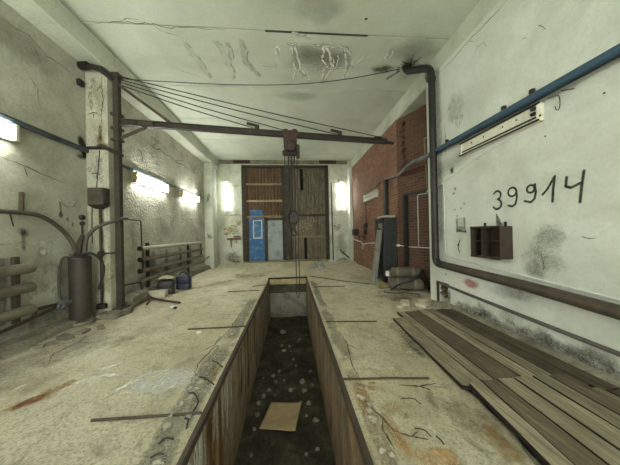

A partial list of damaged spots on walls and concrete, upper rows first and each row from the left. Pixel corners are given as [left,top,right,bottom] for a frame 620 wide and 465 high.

crack [98,18,226,35]
peeling [321,46,369,79]
crack [191,313,240,383]
leakage [457,303,620,378]
rust [3,379,75,411]
crack [362,394,429,449]